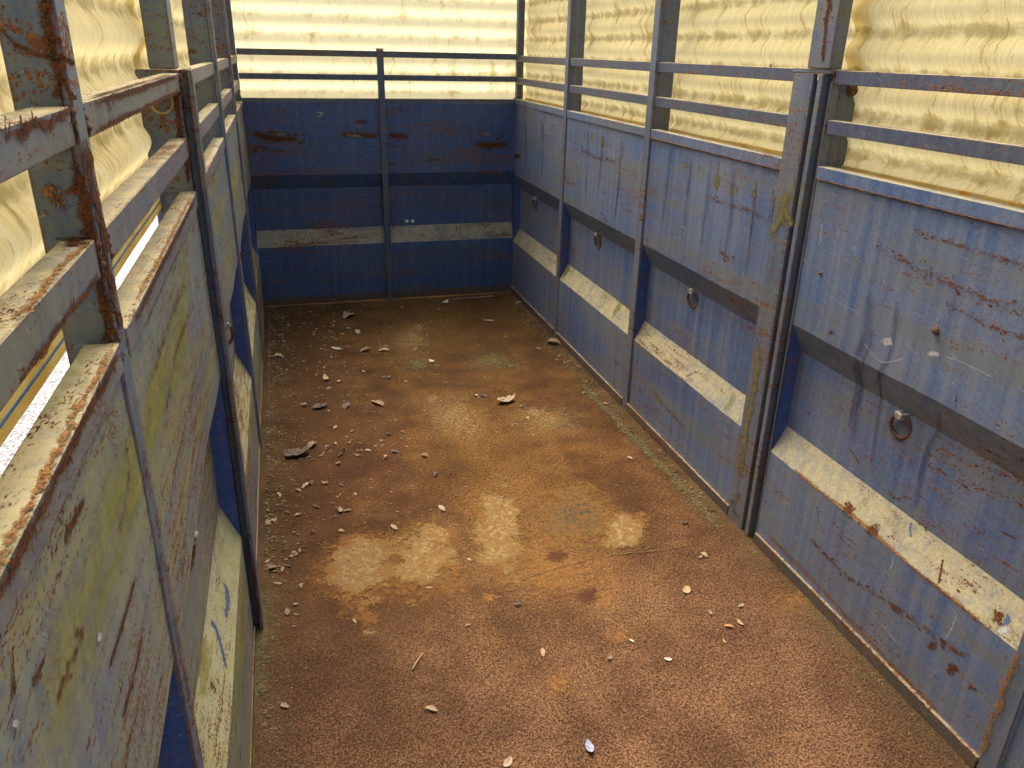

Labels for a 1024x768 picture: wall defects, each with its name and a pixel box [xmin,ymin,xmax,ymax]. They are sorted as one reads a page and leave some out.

rust [3,108,70,143]
rust [341,119,408,151]
rust [41,185,70,212]
rust [5,237,92,327]
rust [23,267,102,380]
rust [876,245,1024,341]
rust [912,228,1024,271]
rust [0,346,131,600]
rust [783,460,1006,635]
rust [768,530,969,718]
rust [973,649,1019,766]